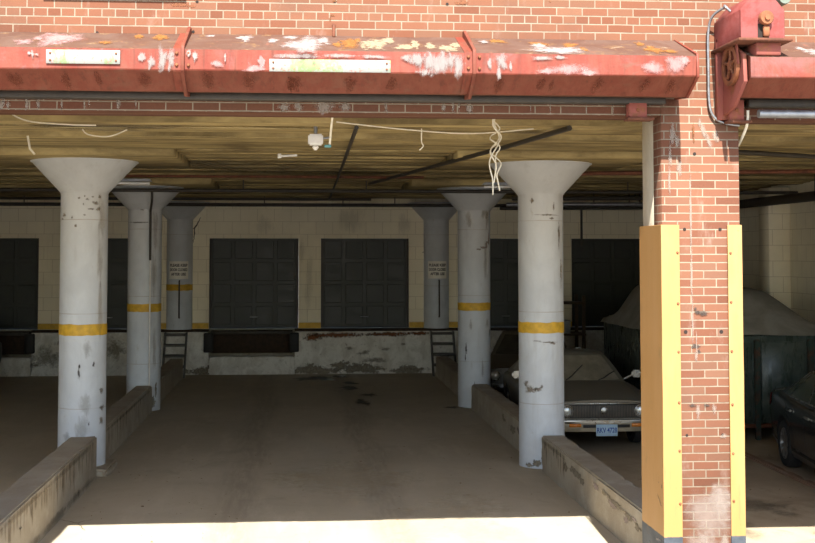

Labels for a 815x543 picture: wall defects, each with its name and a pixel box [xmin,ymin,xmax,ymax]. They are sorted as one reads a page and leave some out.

peeling [138,50,174,70]
peeling [269,36,463,75]
peeling [530,42,594,75]
corrosion [302,331,429,341]
spalling [564,462,641,531]